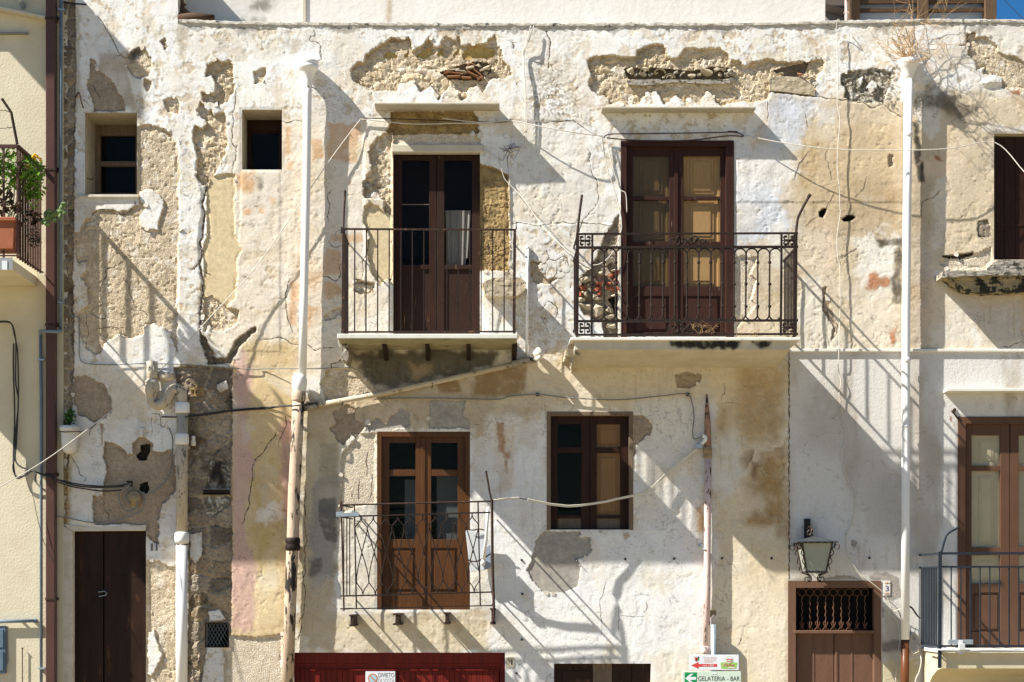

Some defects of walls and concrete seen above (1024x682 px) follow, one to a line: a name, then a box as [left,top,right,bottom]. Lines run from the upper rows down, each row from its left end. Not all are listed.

peeling [64,0,183,425]
crack [193,175,215,359]
peeling [194,57,241,331]
spalling [352,34,512,294]
spalling [589,46,823,106]
spalling [841,68,891,103]
flaking render [93,367,283,682]
crack [242,416,287,525]
peeling [321,367,410,513]
peeling [527,532,591,595]